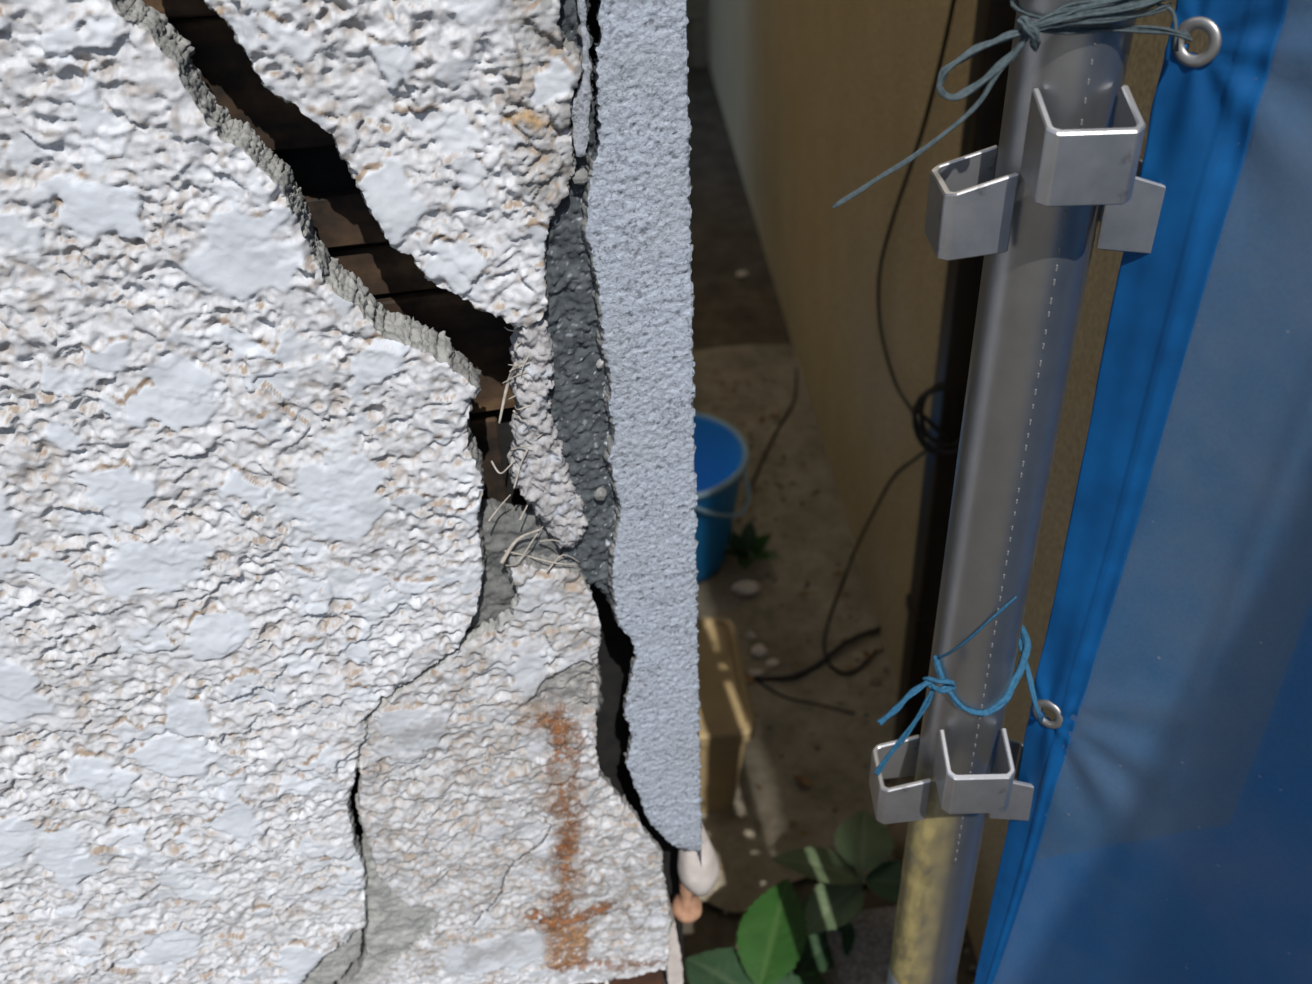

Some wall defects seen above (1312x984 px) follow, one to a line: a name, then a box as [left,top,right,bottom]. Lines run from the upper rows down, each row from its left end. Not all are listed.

spalling [466,0,619,632]
crack [107,0,672,984]
rust [535,712,581,767]
spalling [528,661,600,713]
spalling [300,853,439,984]
rust [525,783,664,971]